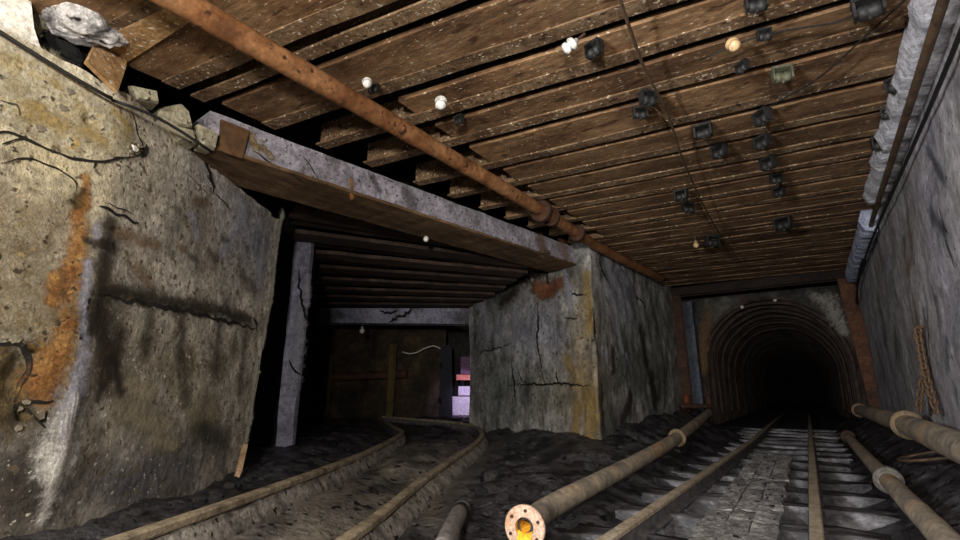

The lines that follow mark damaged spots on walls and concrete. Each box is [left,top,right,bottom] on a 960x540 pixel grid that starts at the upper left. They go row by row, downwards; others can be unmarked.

crack [0,100,149,193]
crack [186,162,231,210]
crack [0,341,53,428]
corrosion [19,173,90,410]
crack [97,294,257,331]
crack [297,270,309,324]
crack [380,307,412,323]
crack [480,304,591,402]